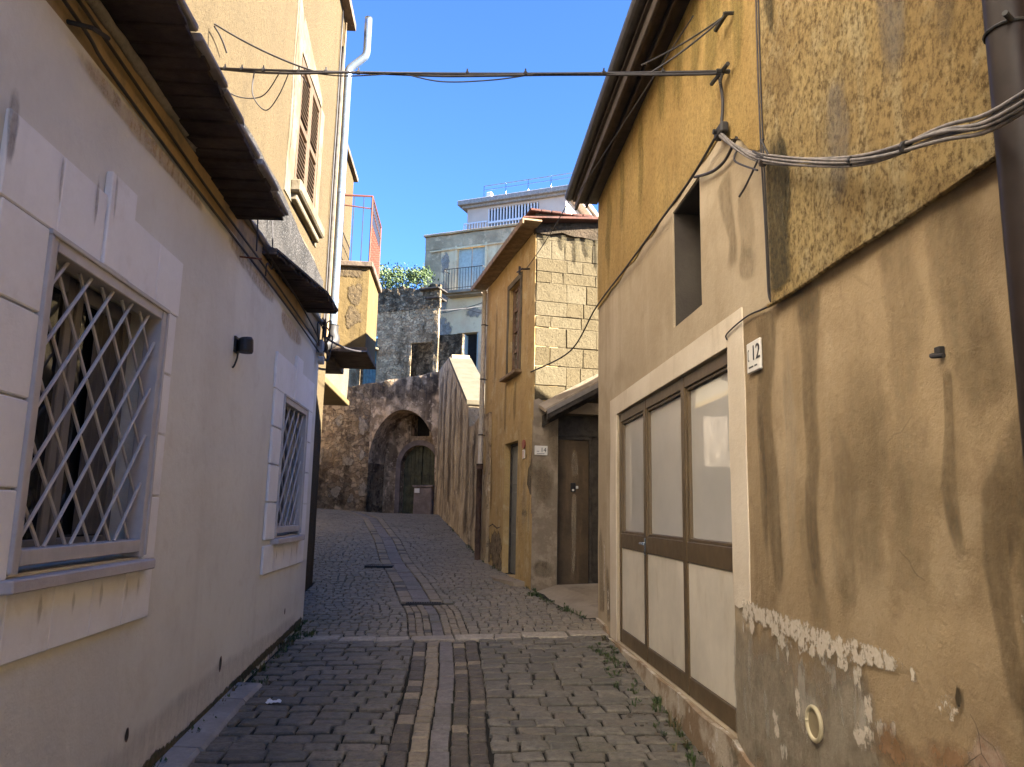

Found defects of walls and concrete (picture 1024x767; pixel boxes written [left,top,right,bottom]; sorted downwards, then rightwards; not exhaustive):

water stain [766,139,790,290]
peeling [735,602,915,767]
spalling [930,736,1006,767]